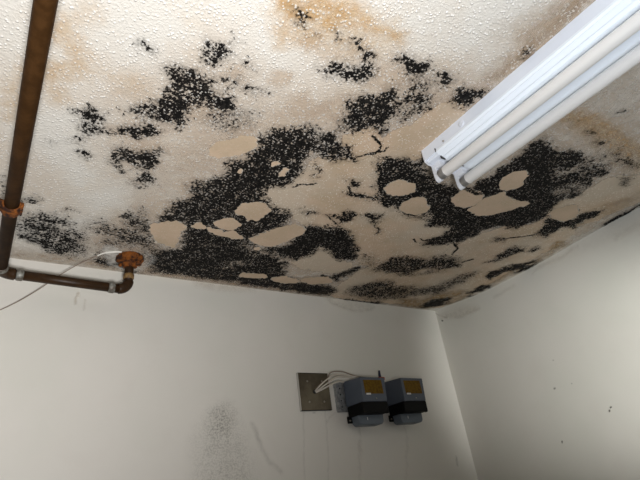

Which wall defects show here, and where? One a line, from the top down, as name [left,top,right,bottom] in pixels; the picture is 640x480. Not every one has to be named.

damp [16,0,640,308]
peeling [149,98,640,308]